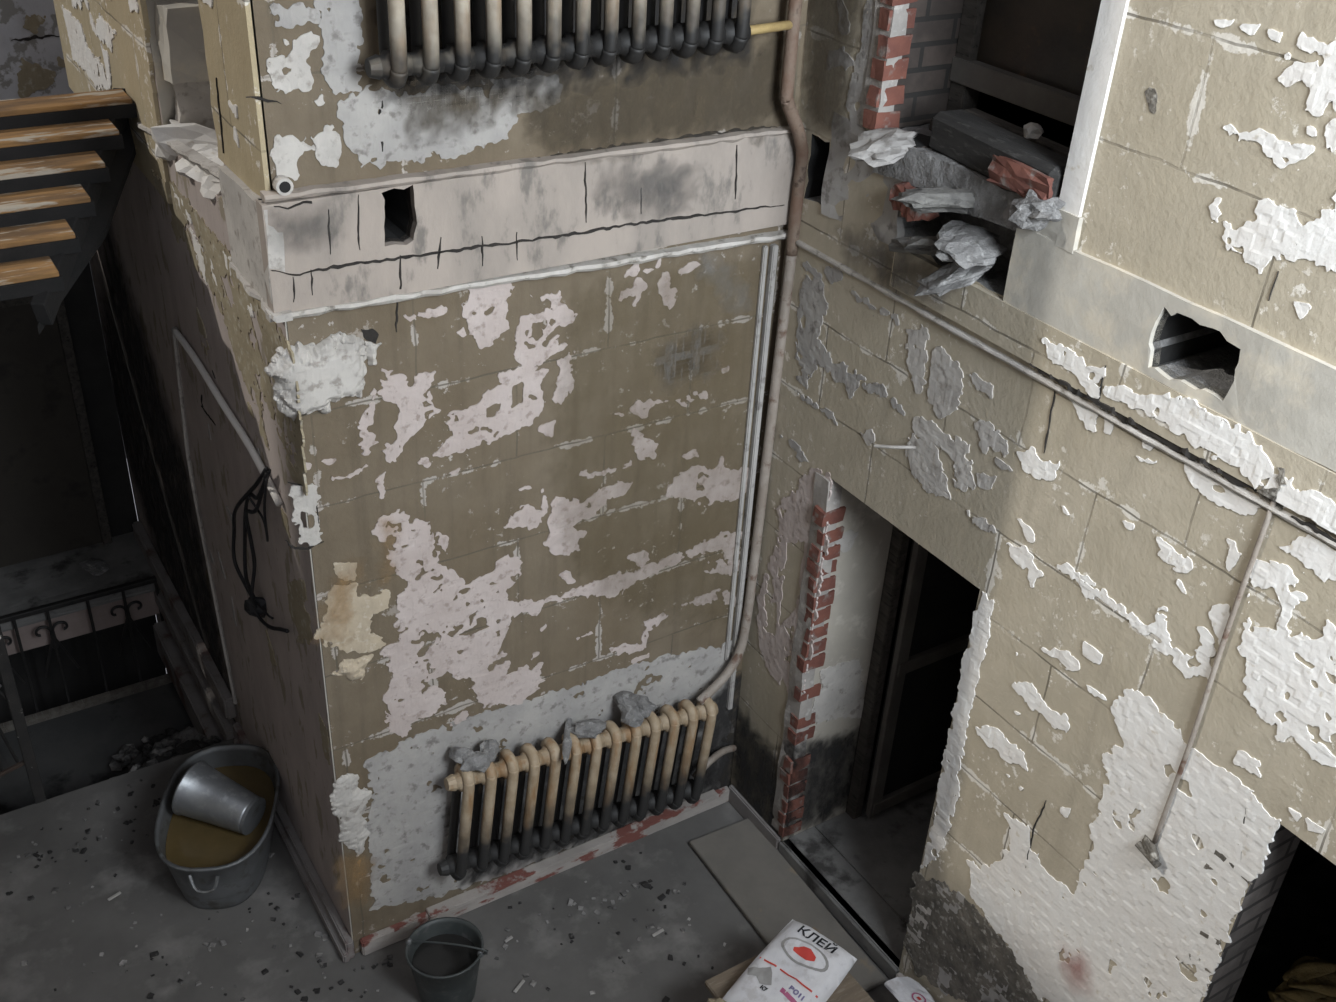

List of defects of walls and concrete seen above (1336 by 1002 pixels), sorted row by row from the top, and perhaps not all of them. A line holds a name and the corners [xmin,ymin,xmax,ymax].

peeling [266,0,563,181]
water stain [411,87,509,127]
peeling [1214,19,1336,169]
crack [258,126,784,332]
peeling [1208,193,1336,274]
peeling [151,169,578,546]
crack [1029,363,1257,493]
peeling [966,337,1336,767]
crack [1291,515,1336,543]
peeling [287,391,866,911]
crack [1027,801,1046,860]
peeling [903,591,1325,1002]